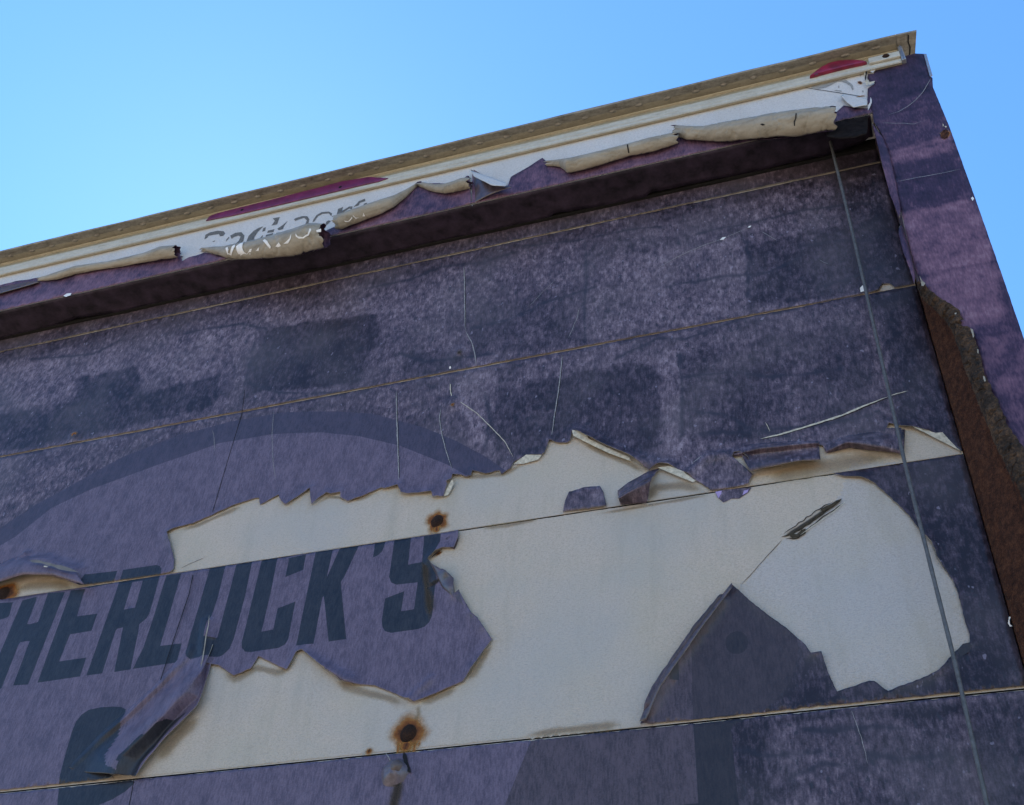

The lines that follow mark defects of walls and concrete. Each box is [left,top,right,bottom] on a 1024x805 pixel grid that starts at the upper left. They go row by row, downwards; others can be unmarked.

peeling [0,70,875,285]
corrosion [917,277,1024,501]
peeling [1,566,80,597]
corrosion [427,511,447,532]
peeling [113,425,970,780]
corrosion [392,716,427,753]